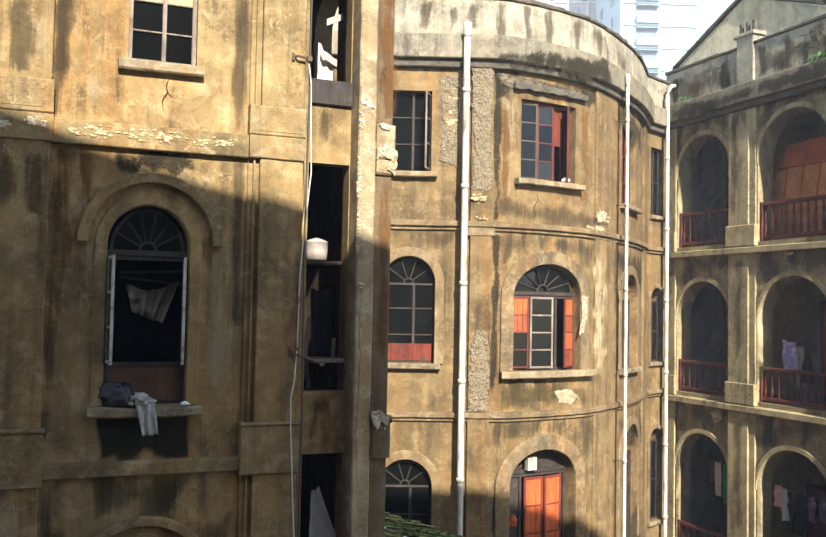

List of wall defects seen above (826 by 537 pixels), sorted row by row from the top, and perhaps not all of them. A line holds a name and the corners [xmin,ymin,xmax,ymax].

water stain [10,0,73,113]
peeling [24,116,47,127]
peeling [68,123,234,147]
flaking render [438,68,580,201]
water stain [394,14,826,228]
water stain [618,252,641,286]
water stain [760,249,826,277]
water stain [490,234,512,388]
flaking render [466,330,490,413]
flaking render [555,389,578,405]